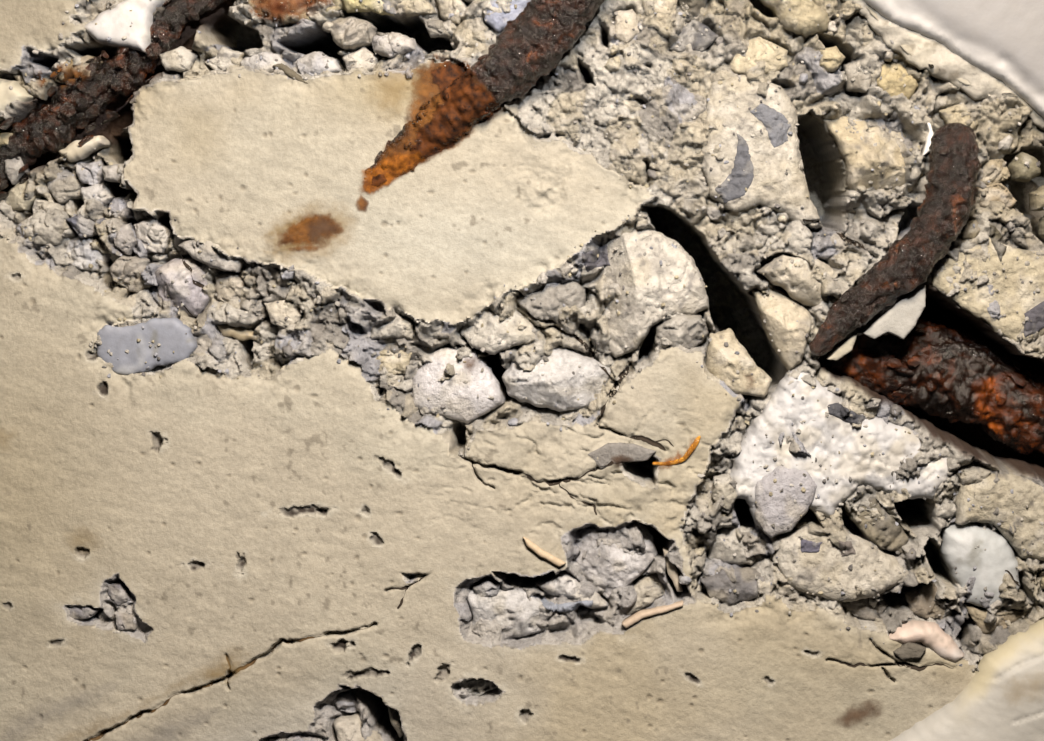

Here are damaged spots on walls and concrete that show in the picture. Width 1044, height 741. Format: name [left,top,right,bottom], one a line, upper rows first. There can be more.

corrosion [253,0,326,20]
spalling [0,0,133,134]
corrosion [0,0,227,201]
corrosion [357,0,605,211]
corrosion [282,214,342,251]
corrosion [809,122,1044,455]
spalling [373,455,403,480]
spalling [620,455,662,490]
spalling [276,504,338,520]
spalling [63,573,153,643]
crack [87,622,376,741]
spalling [259,667,407,741]